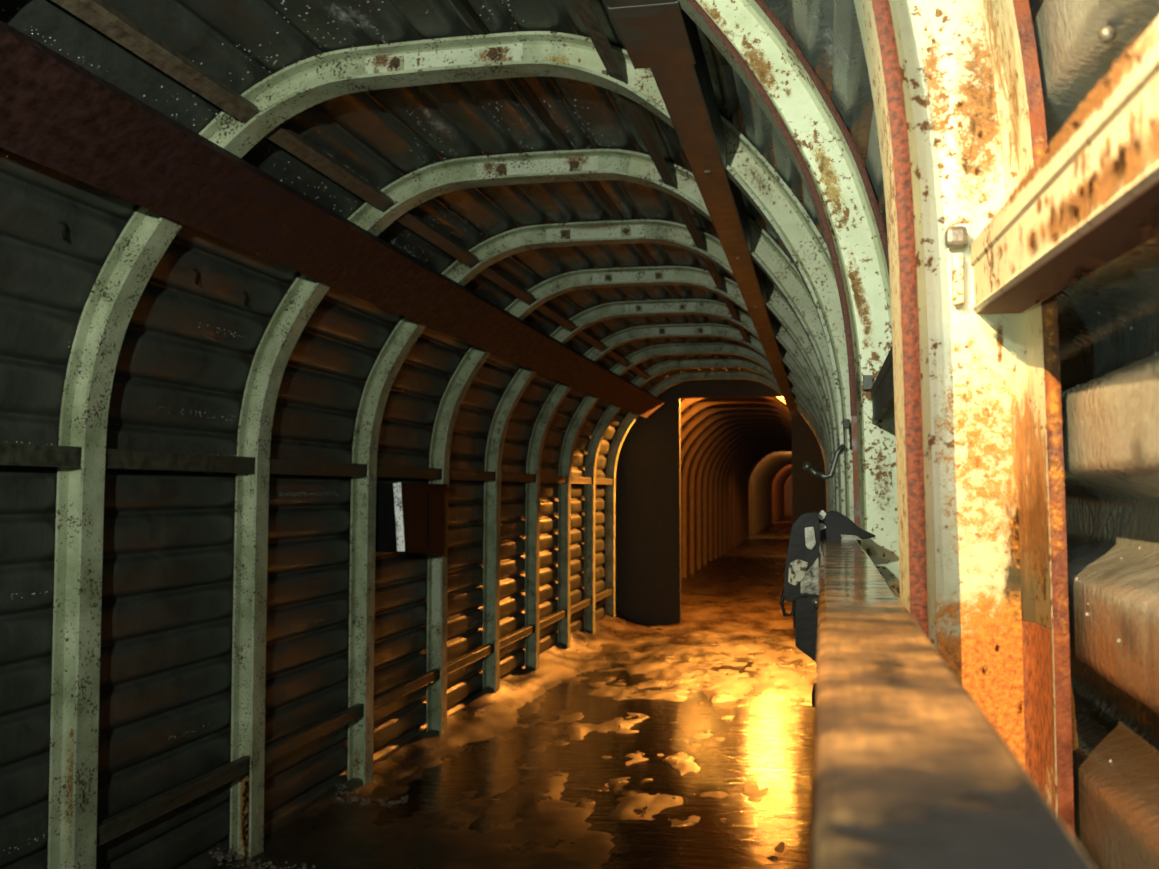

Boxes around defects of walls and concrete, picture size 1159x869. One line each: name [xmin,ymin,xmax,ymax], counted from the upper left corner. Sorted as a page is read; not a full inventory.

corrosion [373,54,389,73]
corrosion [687,0,878,416]
corrosion [755,0,1159,811]